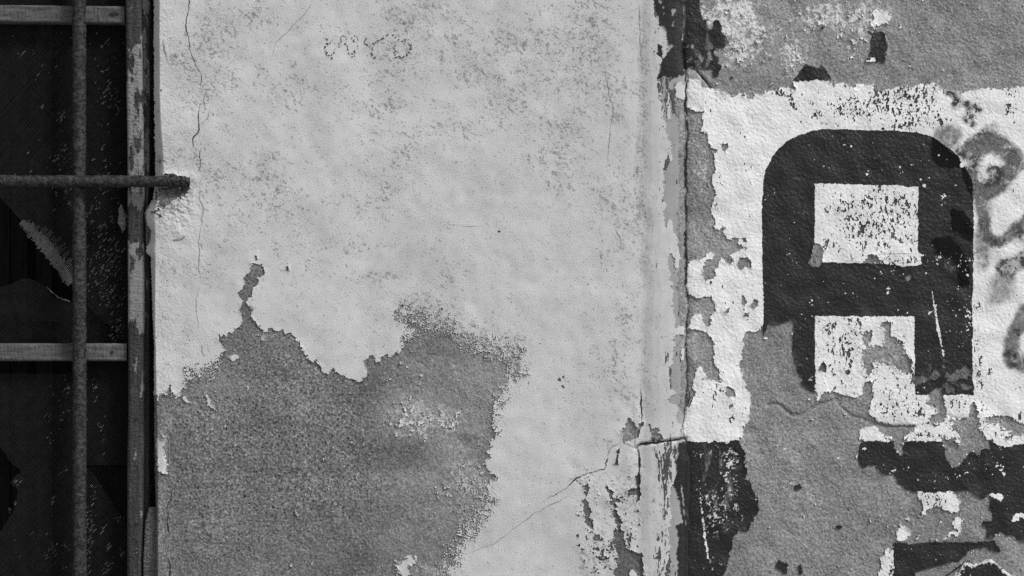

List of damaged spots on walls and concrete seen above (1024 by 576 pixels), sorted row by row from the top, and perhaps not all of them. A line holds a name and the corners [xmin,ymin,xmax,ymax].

crack [163,0,210,325]
peeling [154,255,531,576]
crack [477,52,711,550]
peeling [576,472,646,576]
peeling [614,418,663,466]
peeling [675,0,1024,576]